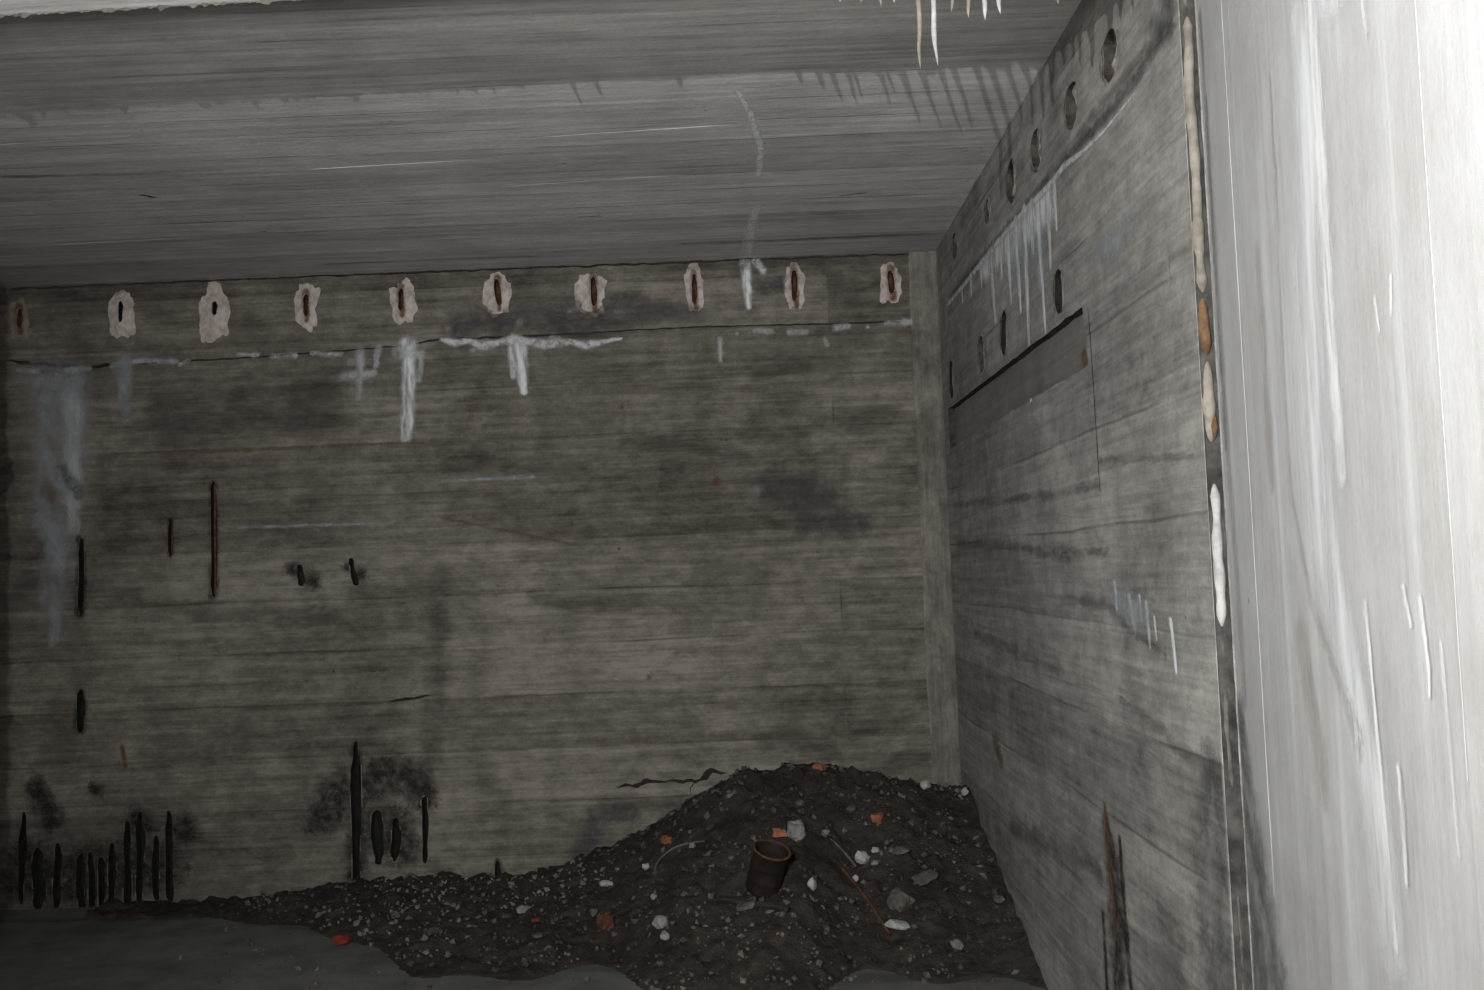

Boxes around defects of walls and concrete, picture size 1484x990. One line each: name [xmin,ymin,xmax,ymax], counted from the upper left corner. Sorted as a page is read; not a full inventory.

leakage [948,73,1140,343]
efflorescence [401,338,422,436]
leakage [441,308,622,395]
crack [618,768,727,794]
rust [1102,804,1133,990]